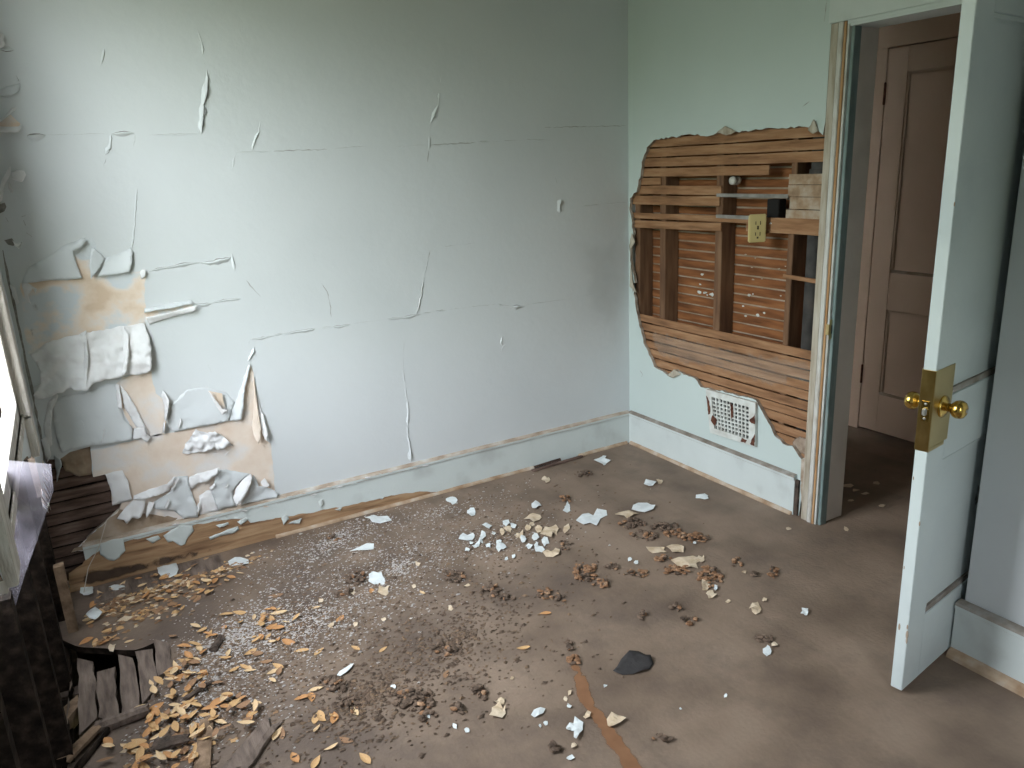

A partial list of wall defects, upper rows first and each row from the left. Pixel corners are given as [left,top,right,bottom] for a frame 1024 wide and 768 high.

crack [232,112,366,168]
flaking render [20,237,198,357]
crack [147,255,265,309]
crack [248,253,634,462]
spalling [629,120,825,503]